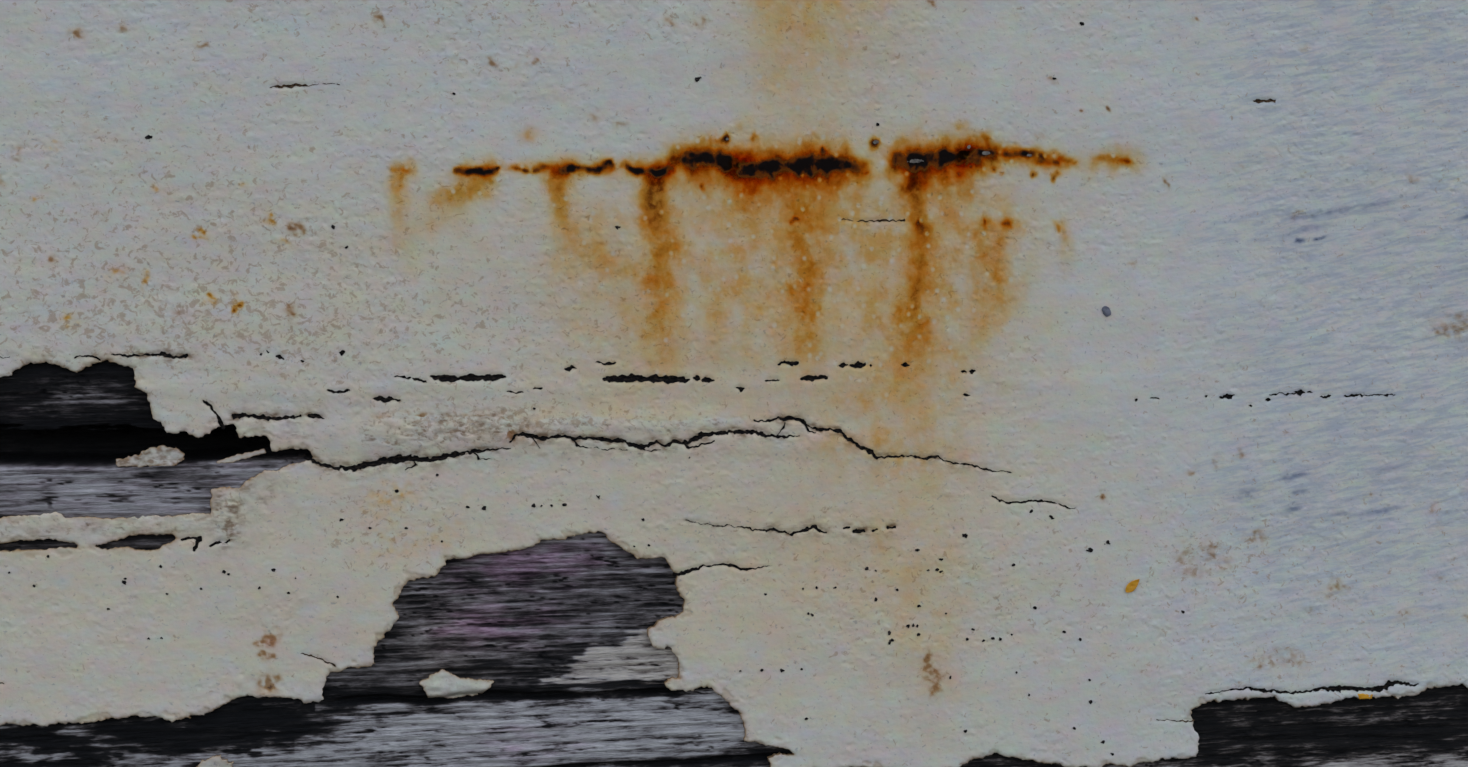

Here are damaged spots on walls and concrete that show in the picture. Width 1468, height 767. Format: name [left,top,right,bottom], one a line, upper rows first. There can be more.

corrosion [454,134,868,224]
corrosion [870,139,1059,235]
peeling [0,360,313,568]
crack [203,350,1075,509]
peeling [0,531,792,767]
peeling [961,753,1064,767]
peeling [1083,684,1468,767]